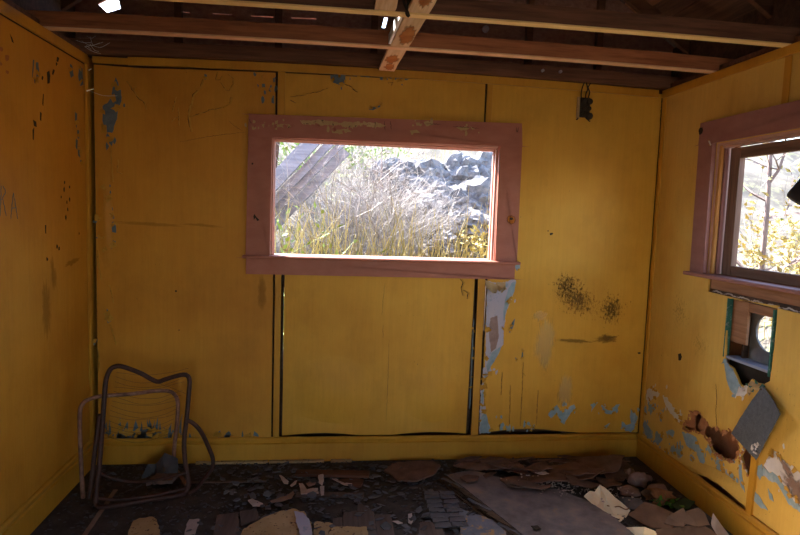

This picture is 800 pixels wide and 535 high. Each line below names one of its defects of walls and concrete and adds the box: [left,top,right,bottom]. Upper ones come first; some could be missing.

peeling [100,77,125,150]
leakage [556,275,591,314]
peeling [469,261,536,434]
peeling [548,401,577,424]
peeling [621,384,800,512]